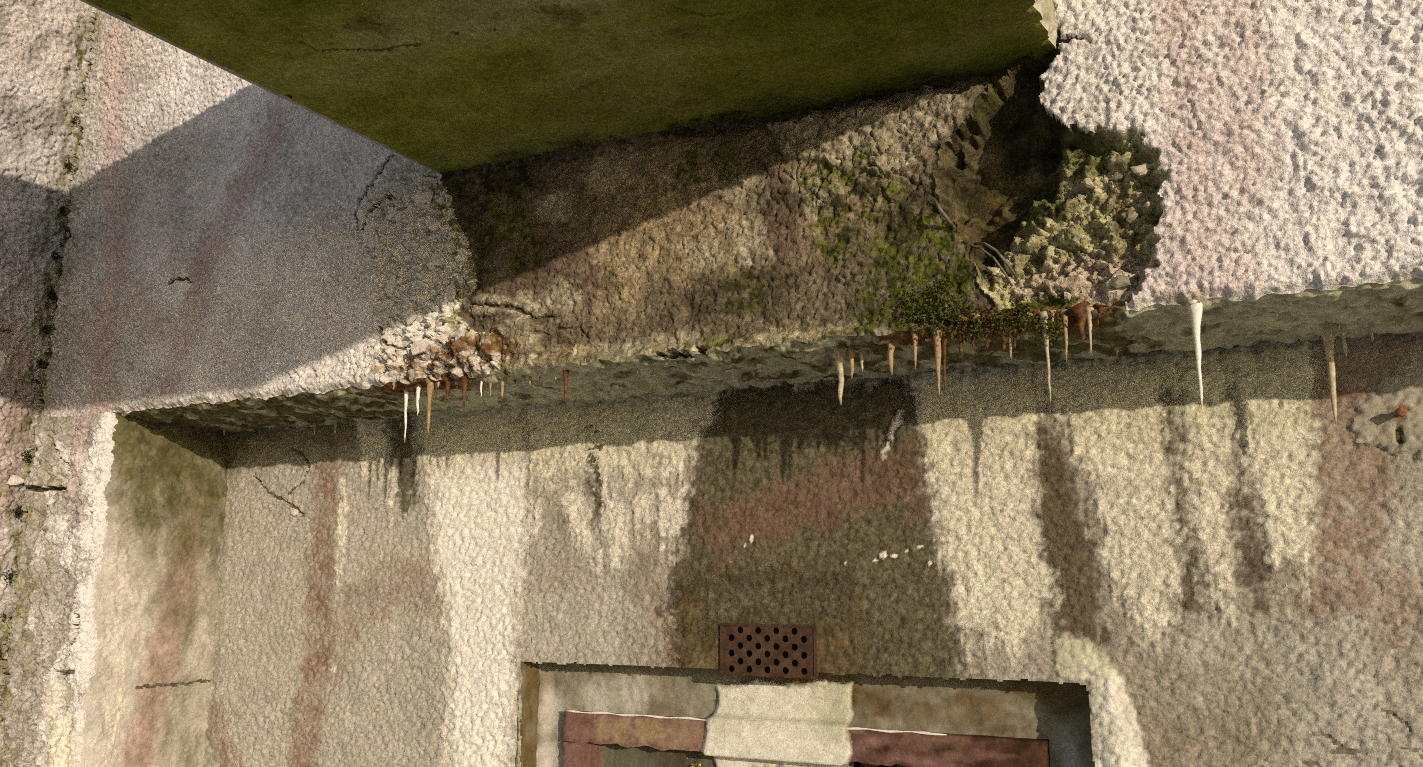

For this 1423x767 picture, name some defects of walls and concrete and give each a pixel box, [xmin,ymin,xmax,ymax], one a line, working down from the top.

crack [354,154,397,230]
spalling [360,32,1169,386]
crack [0,12,96,721]
rust [371,328,581,380]
water stain [512,330,702,369]
rust [1397,405,1409,451]
crack [253,448,310,502]
water stain [333,340,1322,767]
crack [136,679,211,689]